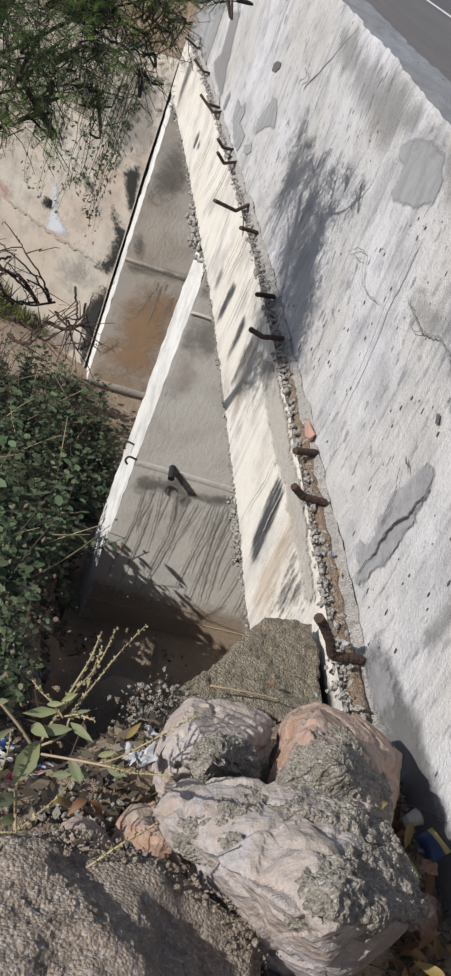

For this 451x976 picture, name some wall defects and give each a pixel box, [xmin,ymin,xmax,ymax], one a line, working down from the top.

damp [123,166,139,209]
corrosion [213,199,250,213]
peeling [391,138,445,239]
damp [72,210,125,279]
damp [80,287,107,365]
corrosion [249,327,285,341]
spalling [189,40,434,736]
corrosion [292,447,319,456]
damp [106,476,246,622]
damp [251,477,283,561]
corrosion [290,483,328,506]
corrosion [314,613,365,665]